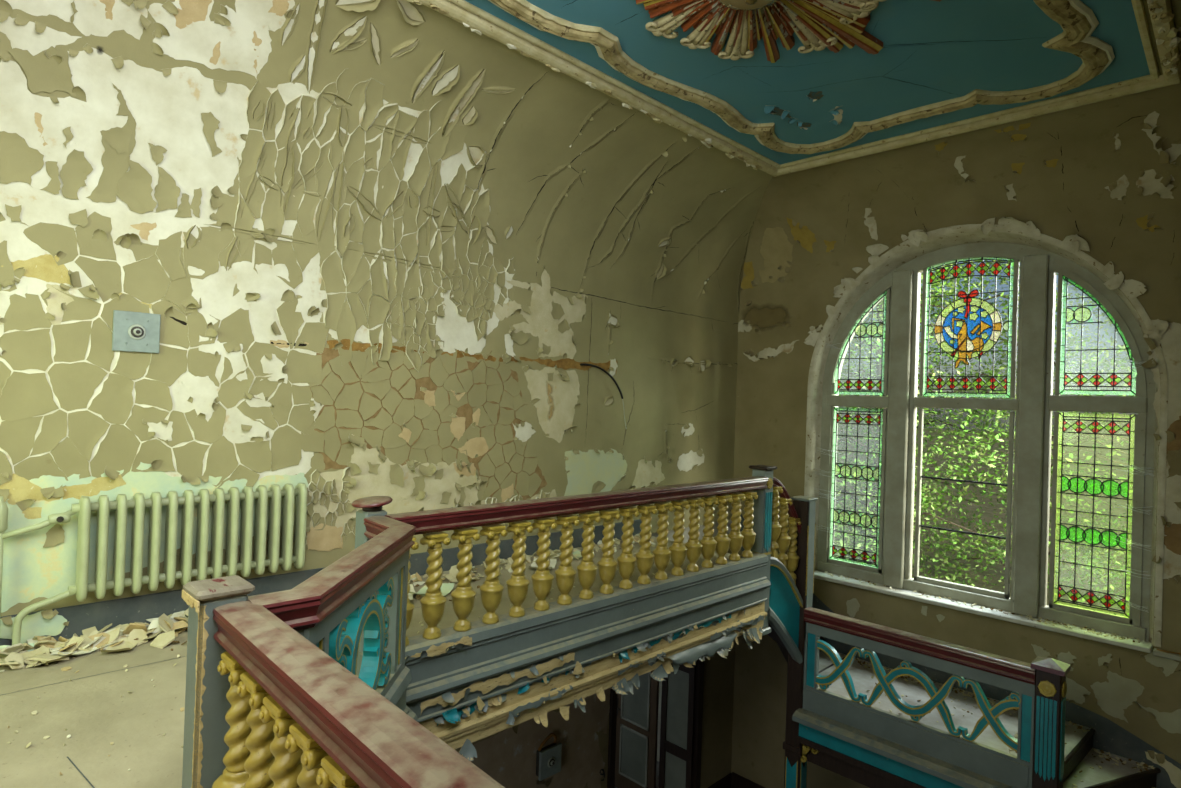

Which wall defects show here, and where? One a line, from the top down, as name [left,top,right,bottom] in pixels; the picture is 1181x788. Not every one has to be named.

crack [477,70,550,194]
peeling [1105,111,1181,202]
peeling [0,0,672,644]
crack [515,98,768,427]
peeling [738,208,889,362]
peeling [1102,261,1147,299]
peeling [677,448,705,472]
peeling [1138,318,1181,586]
peeling [405,636,472,663]
peeling [420,608,764,788]
peeling [1031,644,1181,734]
peeling [1145,750,1181,788]